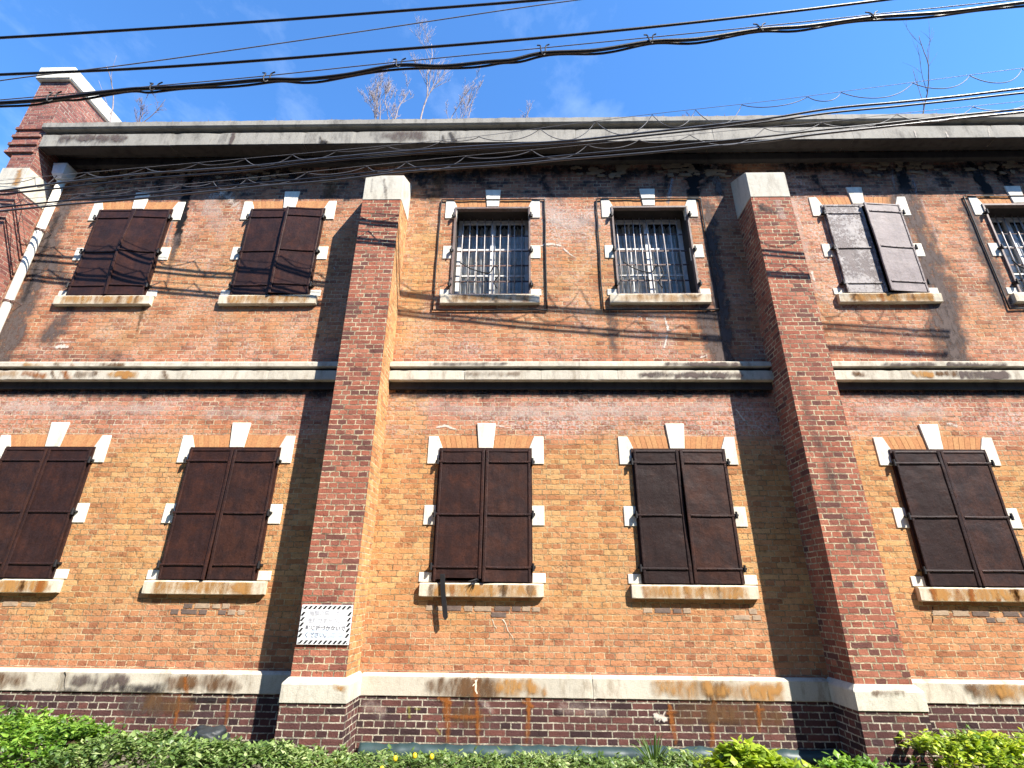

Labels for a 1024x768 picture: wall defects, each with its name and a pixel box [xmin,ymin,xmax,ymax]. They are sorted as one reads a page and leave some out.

damp [884,161,1013,379]
rust [154,581,253,594]
rust [429,584,536,597]
rust [930,588,1024,602]
rust [437,697,481,736]